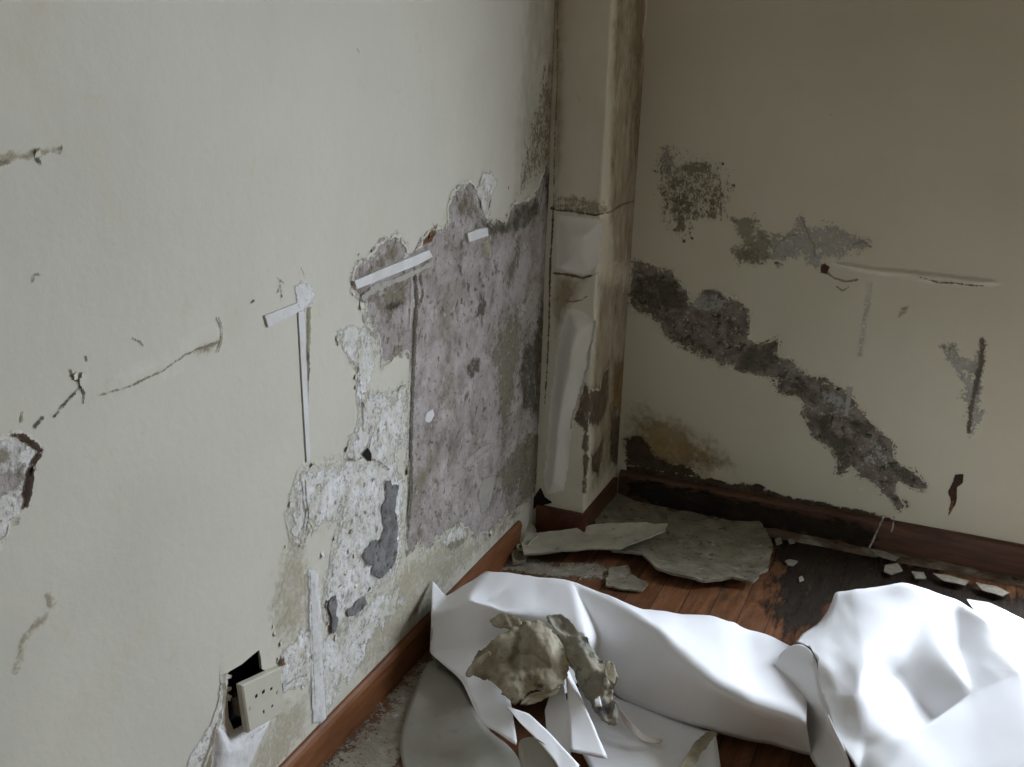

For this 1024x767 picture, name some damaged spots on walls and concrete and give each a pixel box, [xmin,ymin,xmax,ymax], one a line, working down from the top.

leakage [508,0,643,260]
leakage [654,146,786,265]
flaking render [0,429,44,551]
crack [20,317,223,428]
flaking render [284,165,552,641]
leakage [519,434,538,498]
leakage [519,303,544,422]
leakage [592,287,1024,640]
rust [948,474,963,514]
spalling [187,615,315,767]